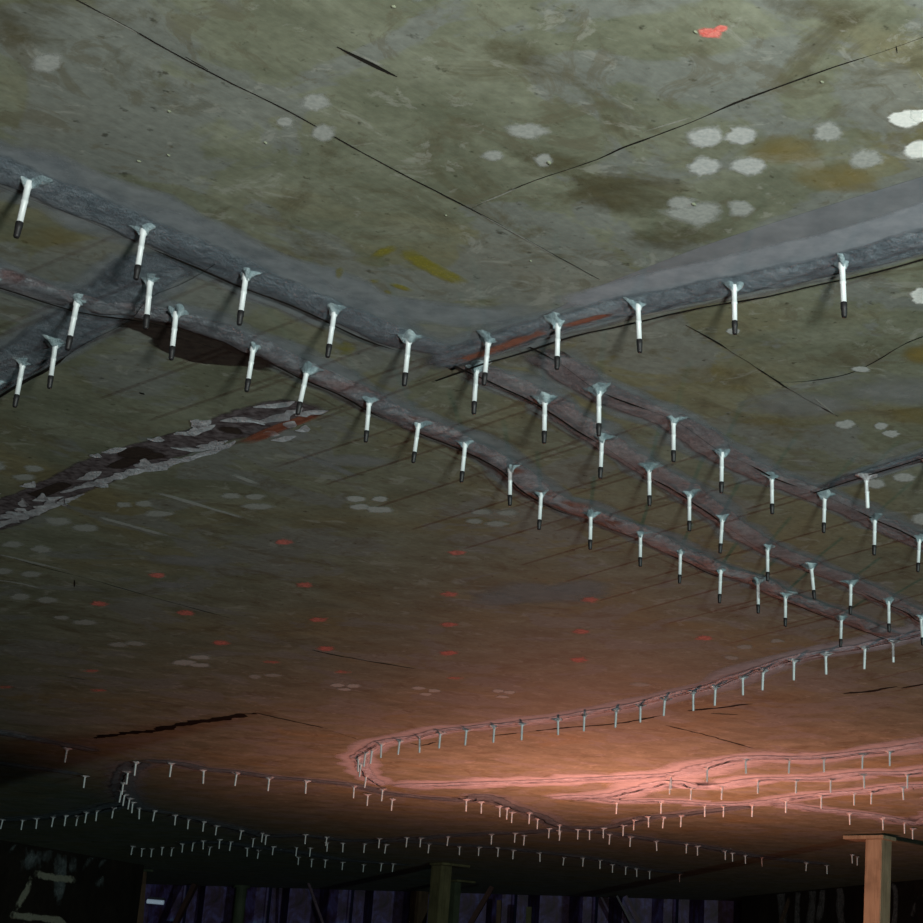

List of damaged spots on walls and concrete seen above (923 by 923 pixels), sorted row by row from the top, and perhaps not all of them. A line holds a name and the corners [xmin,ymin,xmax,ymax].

crack [77,0,923,280]
peeling [0,400,328,530]
crack [0,146,923,865]